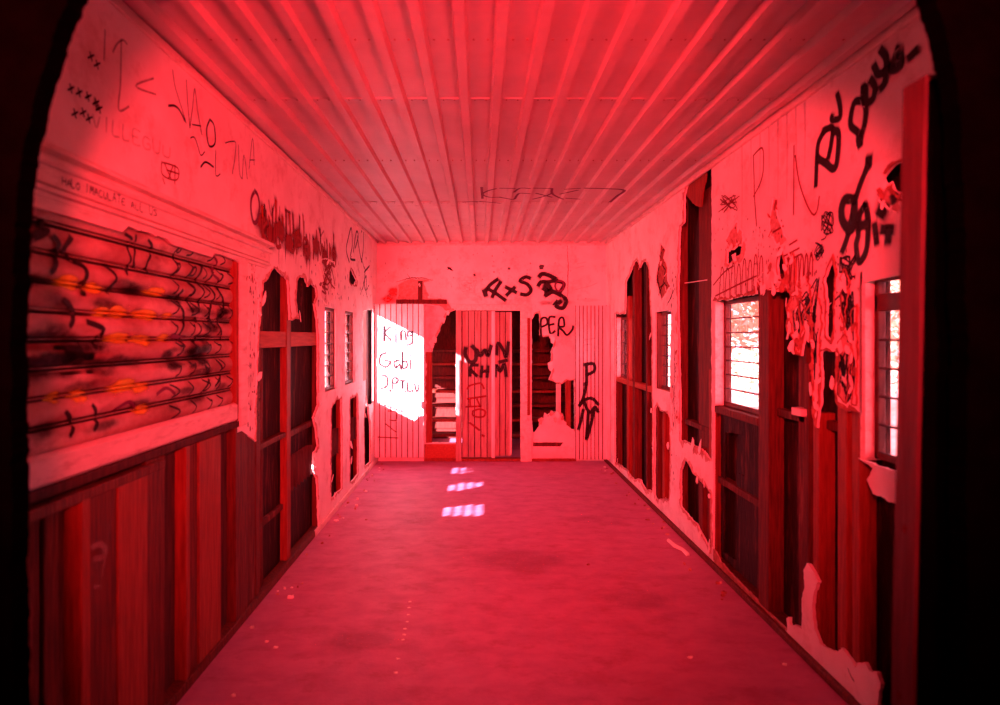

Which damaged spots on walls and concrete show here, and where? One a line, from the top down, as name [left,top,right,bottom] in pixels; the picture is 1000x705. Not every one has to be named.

peeling [246,258,372,501]
peeling [396,278,454,351]
spalling [534,311,575,406]
peeling [538,411,575,431]
peeling [613,187,713,554]
spalling [713,197,860,428]